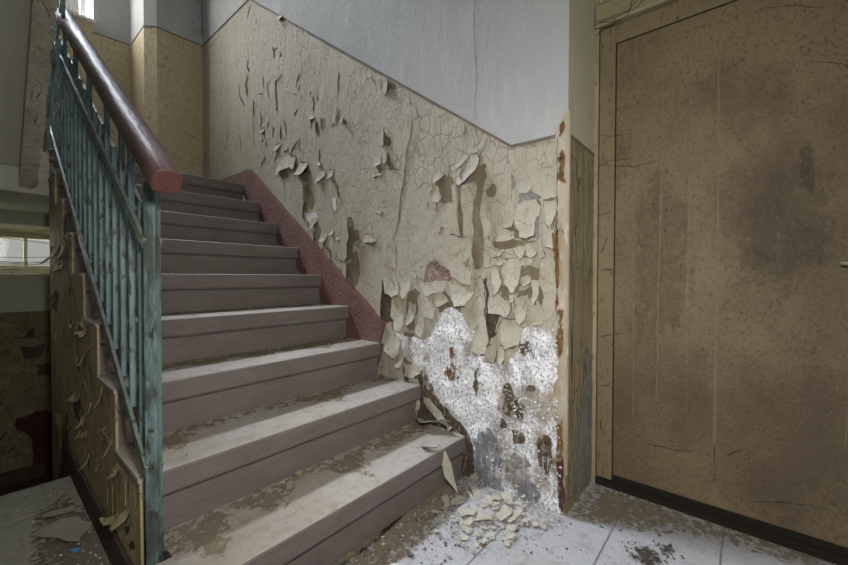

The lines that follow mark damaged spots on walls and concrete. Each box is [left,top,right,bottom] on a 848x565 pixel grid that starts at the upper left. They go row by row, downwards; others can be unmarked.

peeling [380,78,396,96]
peeling [238,62,377,286]
corrosion [557,150,566,182]
peeling [39,213,70,320]
peeling [372,110,593,510]
spalling [15,381,103,473]
damp [395,307,564,514]
peeling [99,463,135,551]
peeling [433,508,547,548]